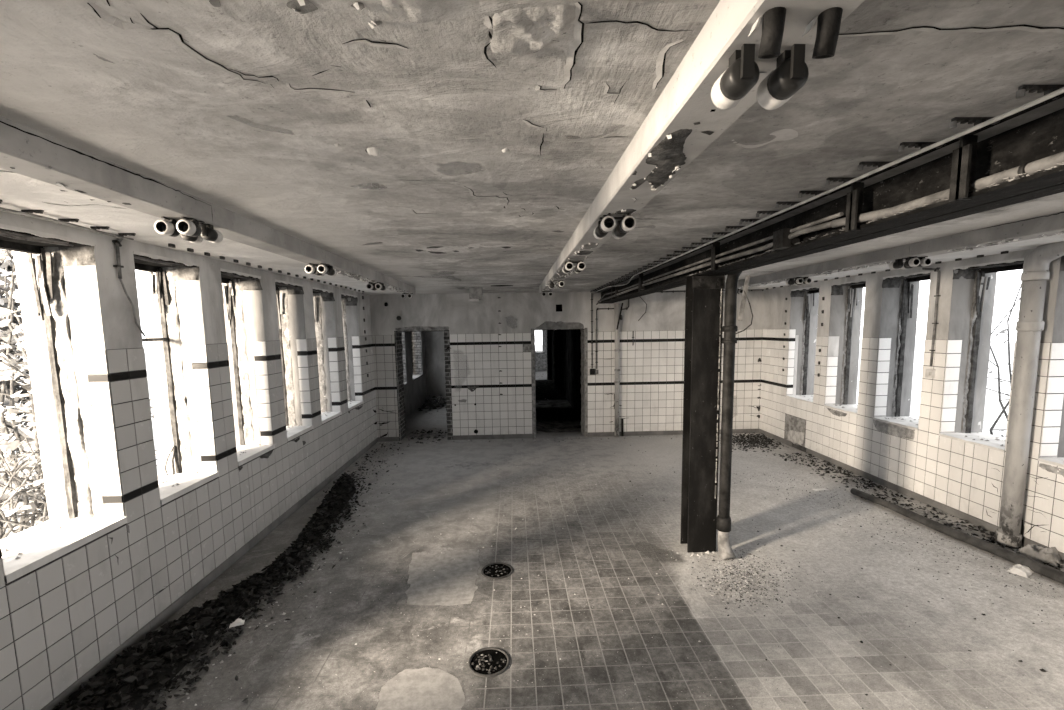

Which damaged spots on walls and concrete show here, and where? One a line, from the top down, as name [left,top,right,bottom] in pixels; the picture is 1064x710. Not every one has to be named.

peeling [286,0,318,14]
crack [87,0,407,107]
crack [484,16,496,67]
crack [534,2,692,104]
crack [838,24,1064,37]
crack [522,119,547,155]
peeling [630,122,714,190]
spalling [785,415,804,446]
spalling [1039,463,1064,477]